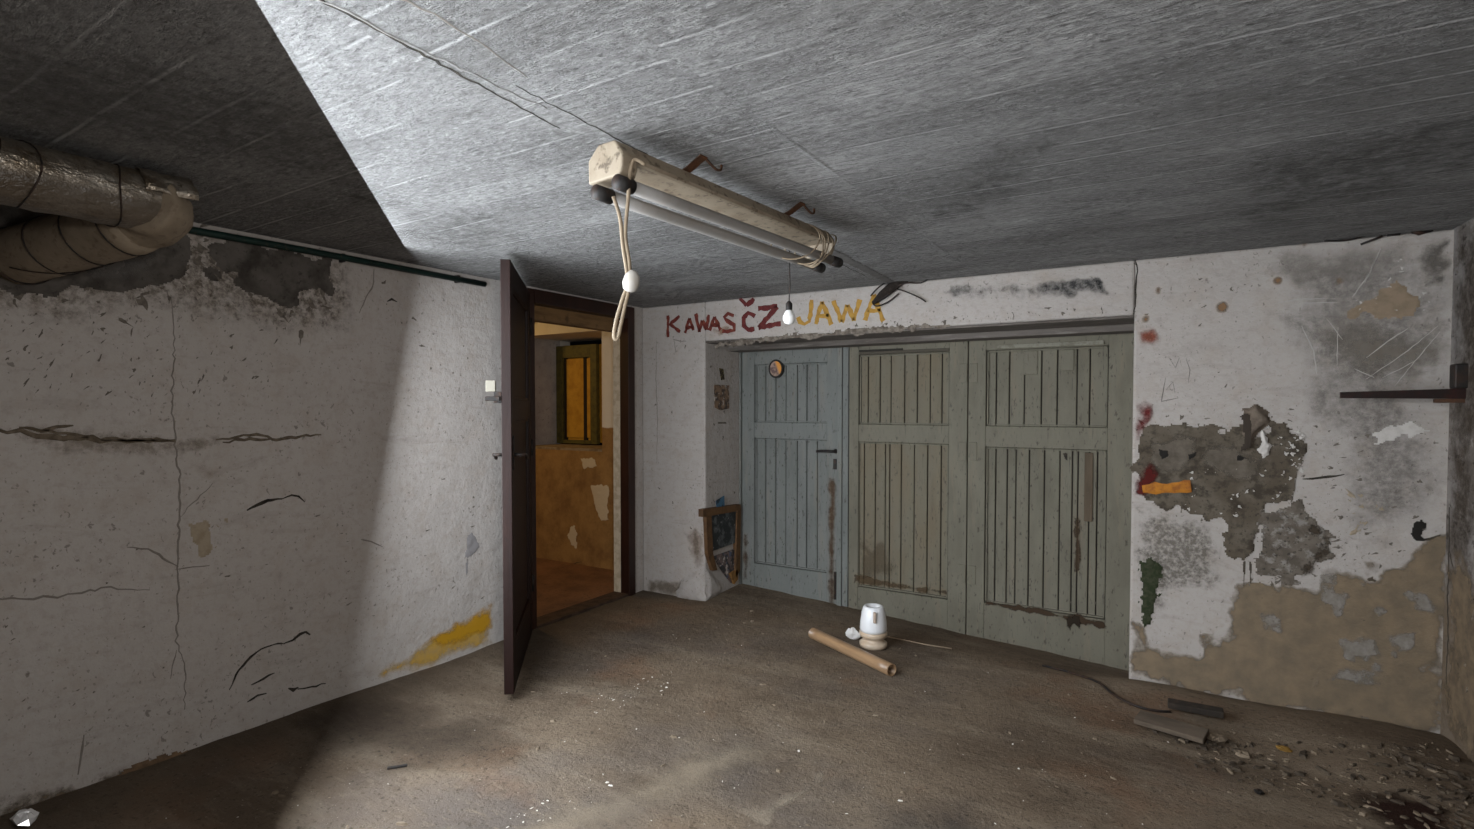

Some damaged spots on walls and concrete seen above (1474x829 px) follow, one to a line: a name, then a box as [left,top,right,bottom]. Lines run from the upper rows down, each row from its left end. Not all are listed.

flaking render [0,204,48,230]
flaking render [0,224,335,397]
crack [216,433,321,443]
crack [0,297,213,710]
crack [247,494,305,511]
flaking render [1130,397,1446,731]
crack [229,631,326,702]
water stain [383,611,491,675]